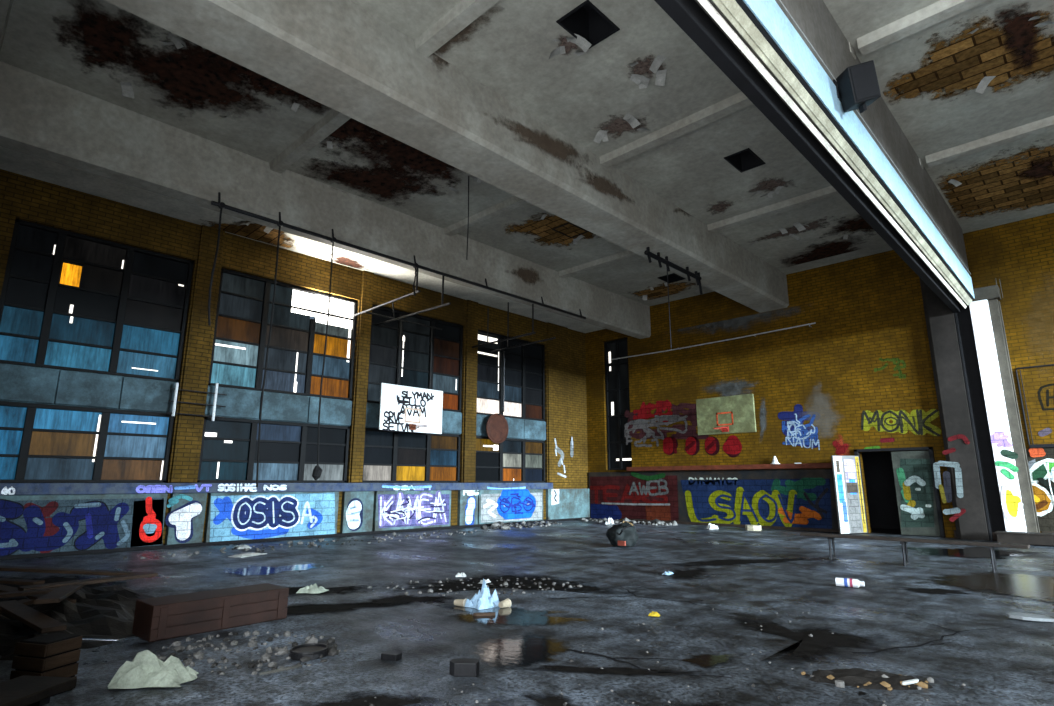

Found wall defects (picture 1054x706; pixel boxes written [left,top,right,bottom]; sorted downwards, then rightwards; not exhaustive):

peeling [883,3,1054,102]
peeling [938,144,1054,218]
peeling [505,213,600,250]